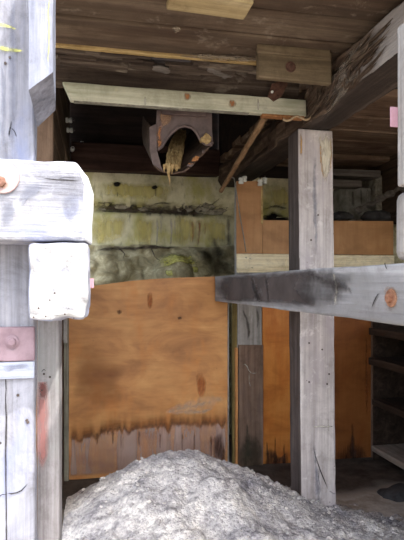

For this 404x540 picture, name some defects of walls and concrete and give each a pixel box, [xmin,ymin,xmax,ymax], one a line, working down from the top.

rust [187,133,213,167]
damp [71,419,226,474]
damp [266,440,288,464]